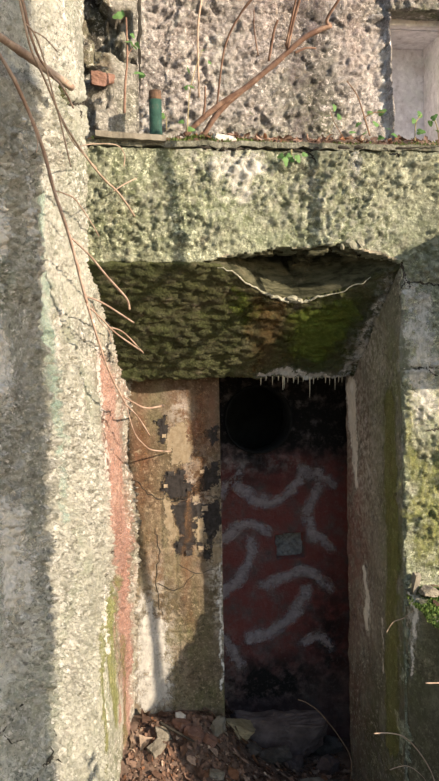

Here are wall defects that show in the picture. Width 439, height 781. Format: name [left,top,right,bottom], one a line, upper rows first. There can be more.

damp [93,320,112,501]
damp [258,301,384,490]
peeling [153,414,222,567]
damp [362,566,370,631]
crack [37,730,62,781]